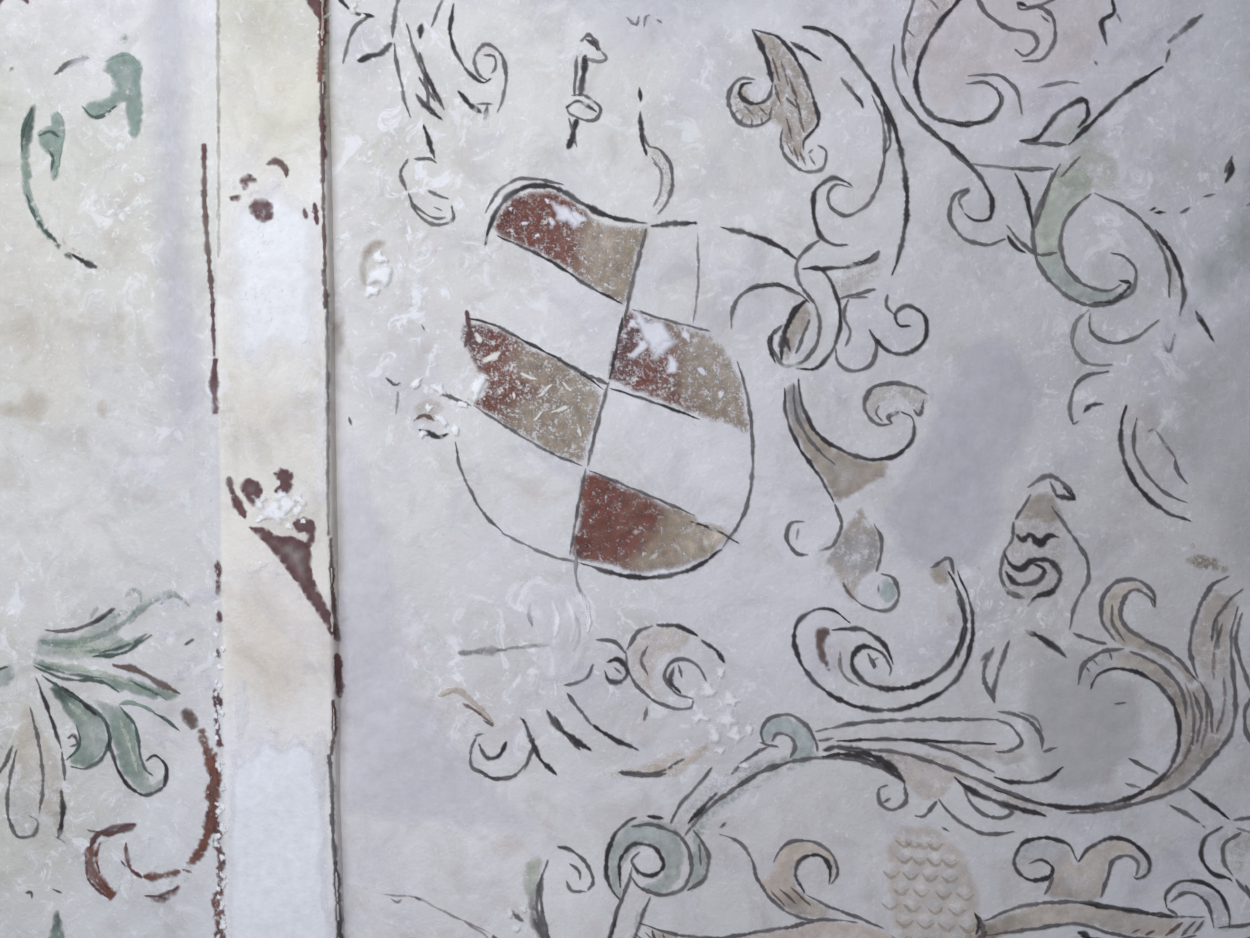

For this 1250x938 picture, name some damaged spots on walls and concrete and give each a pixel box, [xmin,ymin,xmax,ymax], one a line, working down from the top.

peeling [205,611,331,938]